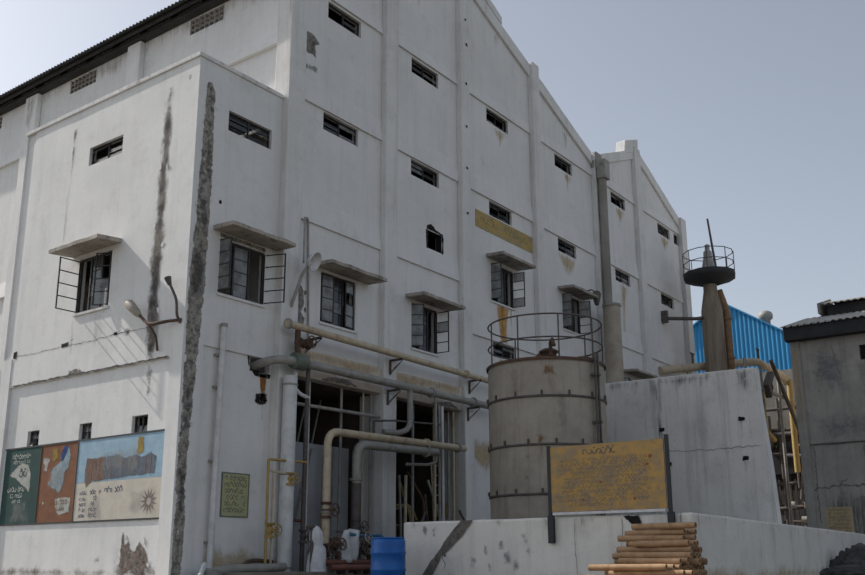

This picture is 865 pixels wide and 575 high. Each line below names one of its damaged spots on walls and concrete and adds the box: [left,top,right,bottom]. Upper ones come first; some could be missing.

spalling [306,31,319,58]
peeling [171,82,219,575]
corrosion [498,306,508,343]
crack [813,445,865,524]
flaking render [117,535,149,575]